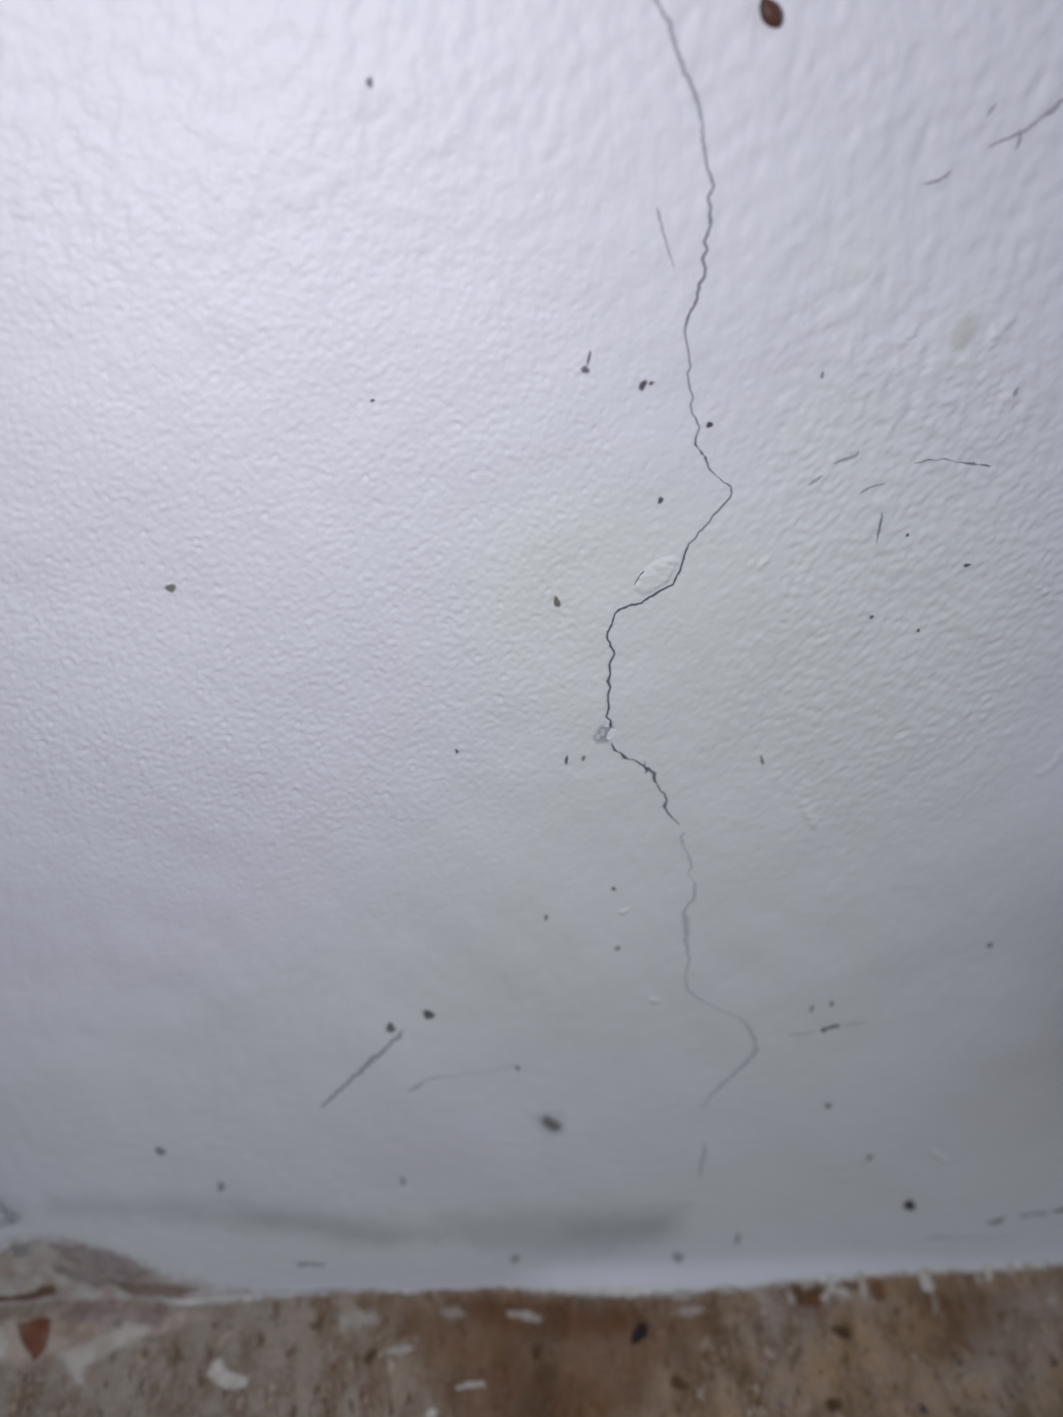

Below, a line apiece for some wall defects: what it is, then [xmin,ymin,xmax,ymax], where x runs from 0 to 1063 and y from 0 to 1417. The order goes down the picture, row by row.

crack [685,203,711,328]
crack [605,435,732,824]